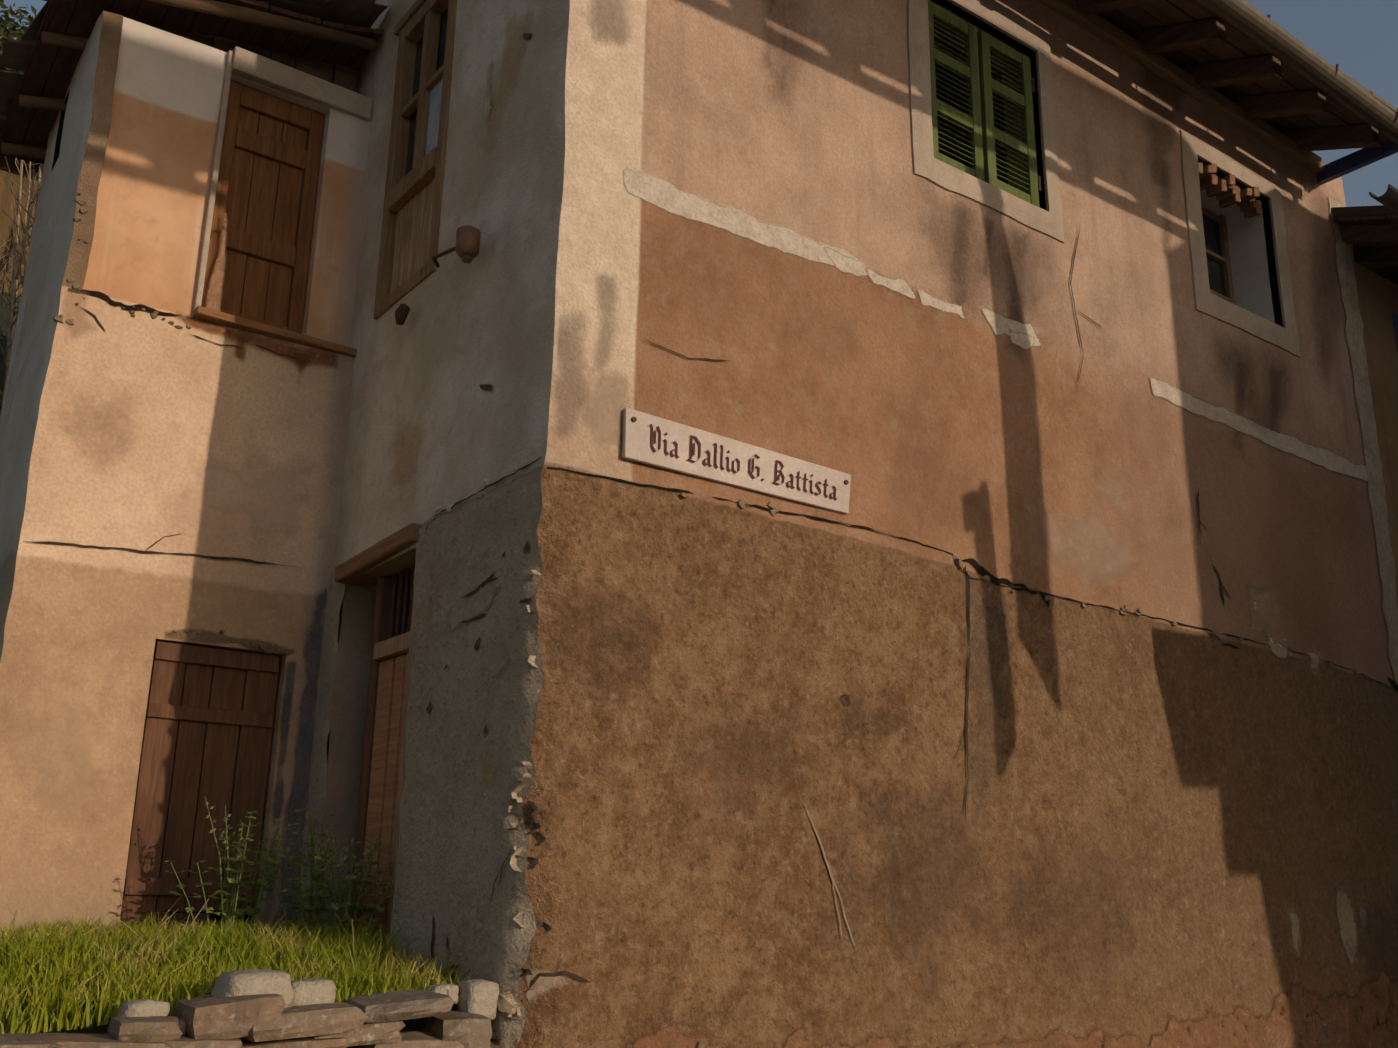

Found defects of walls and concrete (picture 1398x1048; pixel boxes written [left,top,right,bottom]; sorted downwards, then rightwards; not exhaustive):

crack [68,288,302,360]
crack [25,533,305,568]
crack [425,457,1398,827]
spalling [504,761,546,872]
spalling [513,912,552,934]
spalling [497,969,555,1020]